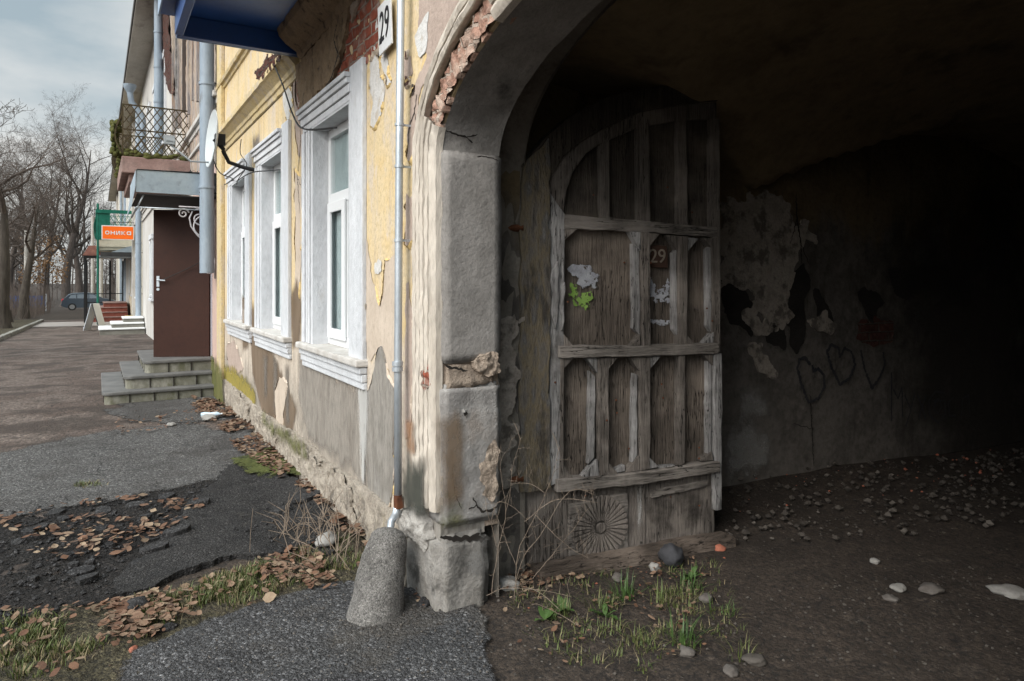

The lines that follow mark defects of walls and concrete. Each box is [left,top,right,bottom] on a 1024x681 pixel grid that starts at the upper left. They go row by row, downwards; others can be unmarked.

spalling [282,0,494,297]
crack [446,130,497,160]
flaking render [233,377,358,532]
peeling [365,240,431,457]
crack [440,498,499,543]
peeling [470,316,525,503]
peeling [720,189,837,380]